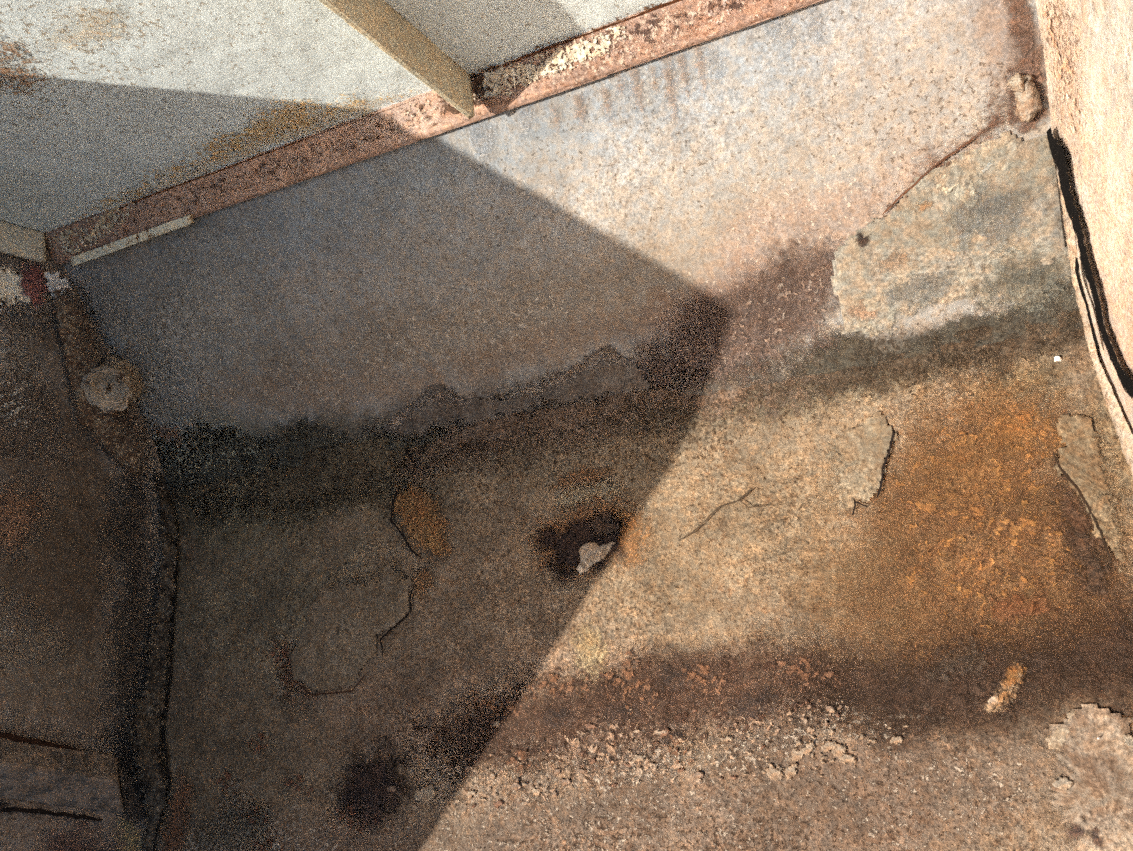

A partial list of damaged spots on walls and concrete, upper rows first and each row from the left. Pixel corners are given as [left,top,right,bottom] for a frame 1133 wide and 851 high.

rust [78,87,419,221]
rust [460,0,682,107]
rust [927,0,1088,169]
peeling [831,126,1072,337]
crack [1047,127,1133,399]
peeling [825,412,898,515]
peeling [1053,414,1133,588]
water stain [575,628,607,673]
rust [407,393,1133,822]
water stain [987,667,1021,711]
water stain [335,748,439,829]
peeling [1040,704,1133,851]